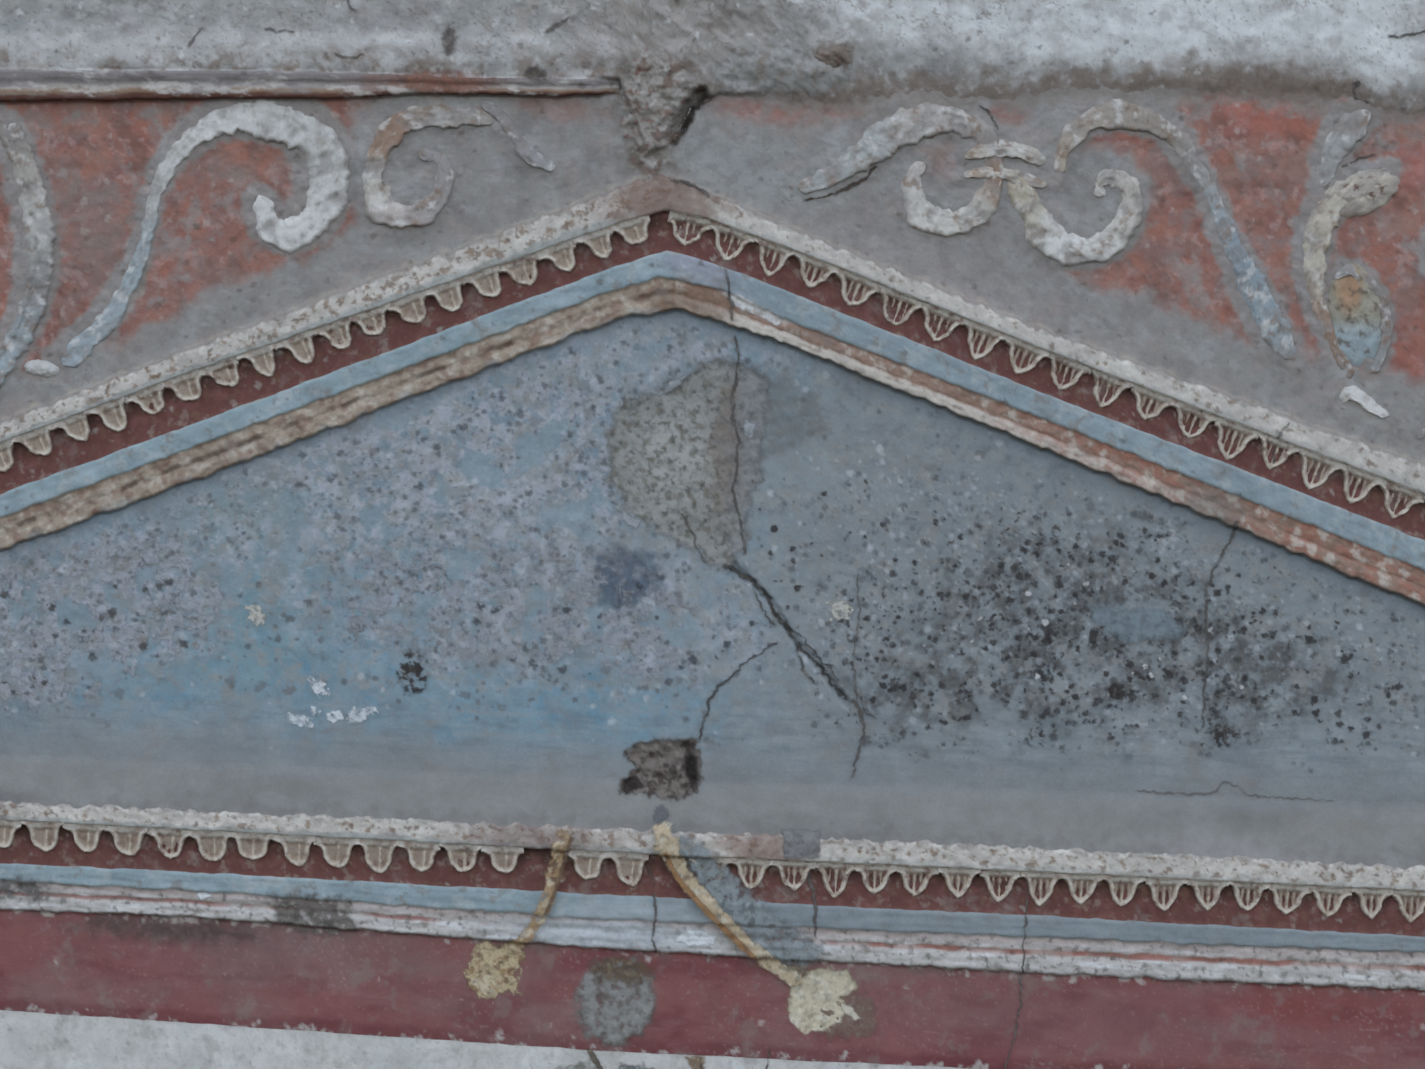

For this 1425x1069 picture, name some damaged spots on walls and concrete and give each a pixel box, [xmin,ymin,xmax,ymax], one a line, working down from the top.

spalling [674,89,712,145]
leakage [0,536,223,715]
spalling [605,359,772,569]
crack [682,270,874,777]
leakage [833,508,1403,747]
crack [1198,521,1238,727]
spalling [620,738,703,824]
crack [1004,882,1029,1069]